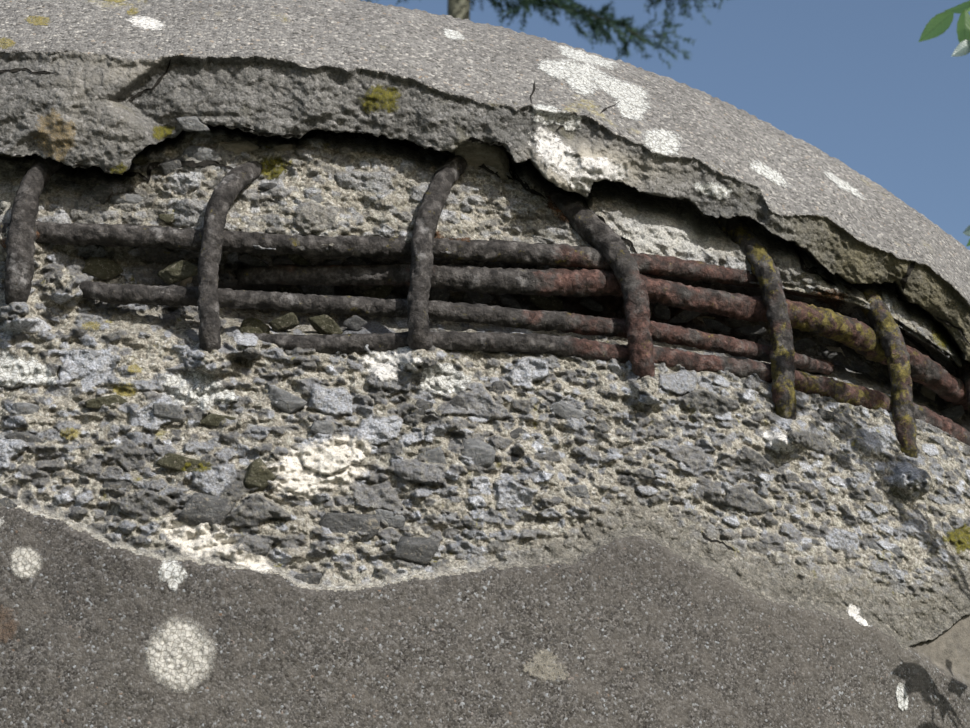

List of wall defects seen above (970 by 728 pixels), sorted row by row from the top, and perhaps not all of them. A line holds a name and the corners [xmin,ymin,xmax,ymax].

crack [0,67,58,75]
crack [128,59,171,100]
crack [69,160,233,183]
crack [210,125,545,198]
crack [581,195,636,253]
spalling [0,50,970,458]
crack [788,240,836,285]
rust [811,289,849,308]
crack [895,262,970,368]
spalling [0,236,970,650]